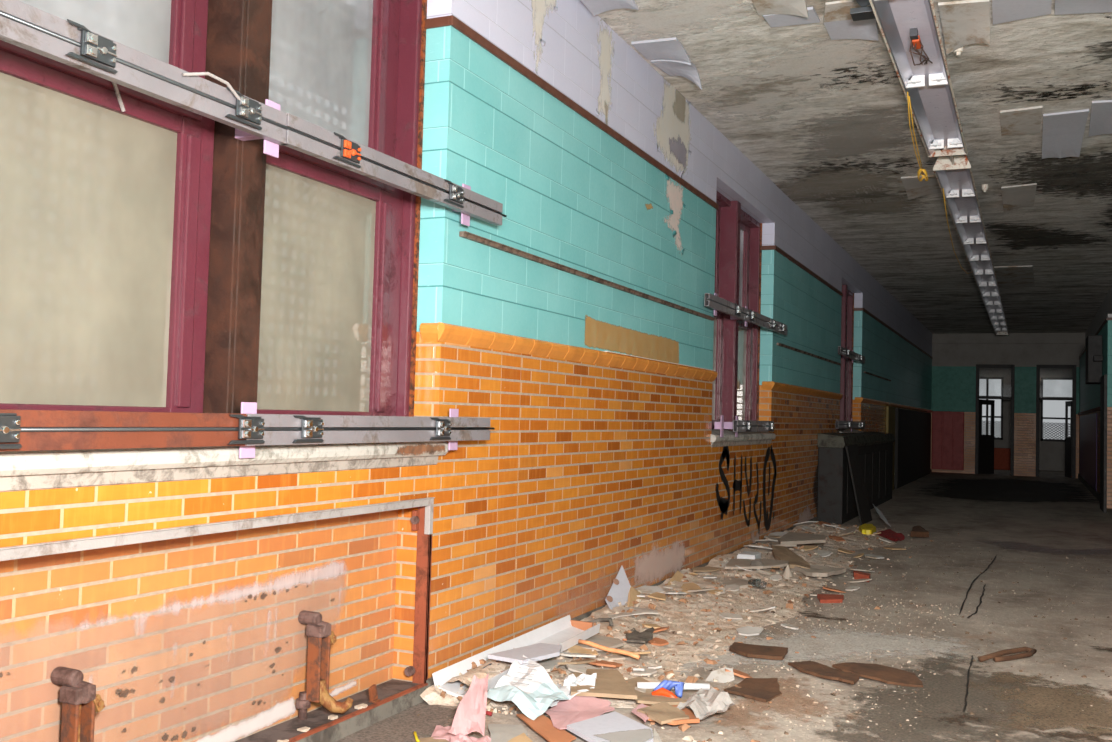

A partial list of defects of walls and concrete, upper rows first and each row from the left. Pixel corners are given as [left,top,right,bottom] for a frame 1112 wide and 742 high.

peeling [532,0,558,74]
peeling [596,21,614,125]
damp [721,62,898,107]
damp [977,41,1112,105]
flaking render [653,38,886,255]
damp [778,155,935,215]
damp [977,147,1112,253]
damp [160,563,343,611]
crack [959,555,997,618]
crack [963,655,994,711]